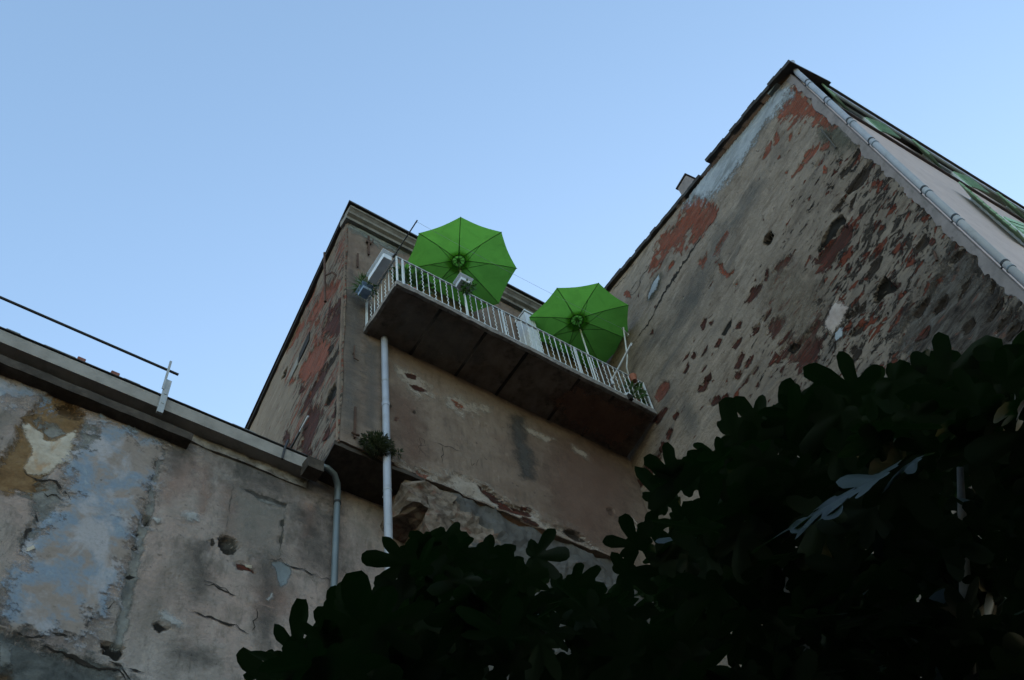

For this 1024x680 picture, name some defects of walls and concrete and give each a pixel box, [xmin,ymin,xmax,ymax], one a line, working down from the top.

spalling [762,85,874,273]
peeling [282,276,344,455]
crack [615,218,715,335]
peeling [647,195,719,300]
spalling [682,251,901,405]
spalling [913,233,935,254]
peeling [0,393,101,553]
crack [194,581,258,634]
spalling [211,537,254,574]
spalling [380,459,599,550]
water stain [511,415,535,479]
peeling [652,382,679,459]